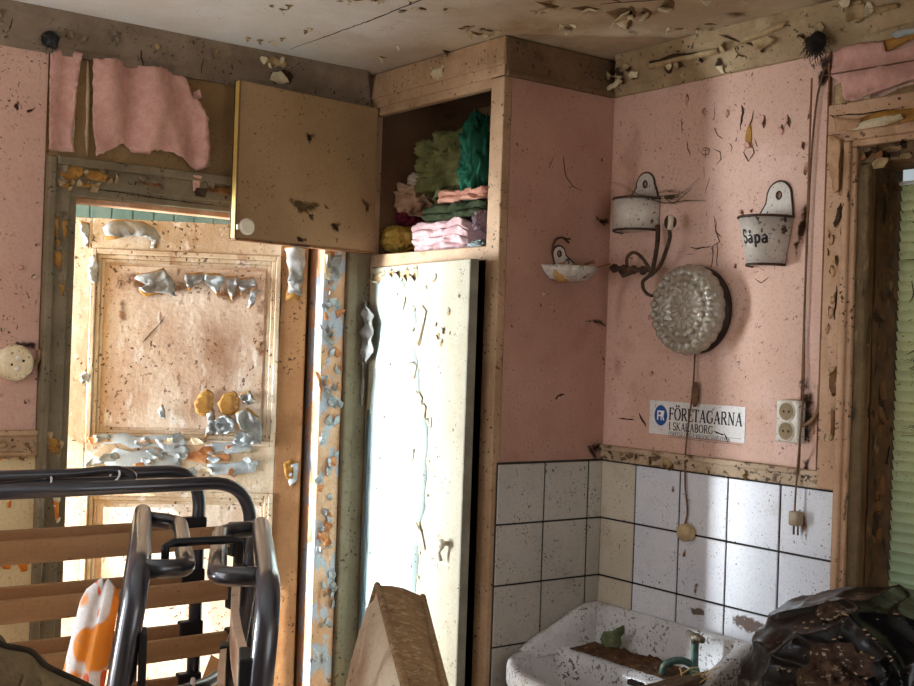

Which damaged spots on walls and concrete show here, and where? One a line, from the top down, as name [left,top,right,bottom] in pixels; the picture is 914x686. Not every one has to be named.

peeling [558,0,675,35]
peeling [882,28,914,51]
peeling [57,164,119,193]
peeling [193,175,230,198]
peeling [53,212,99,296]
peeling [102,219,161,248]
peeling [134,268,257,310]
peeling [315,253,345,445]
peeling [84,389,263,477]
peeling [358,266,450,634]
peeling [620,452,674,471]
peeling [314,452,339,554]